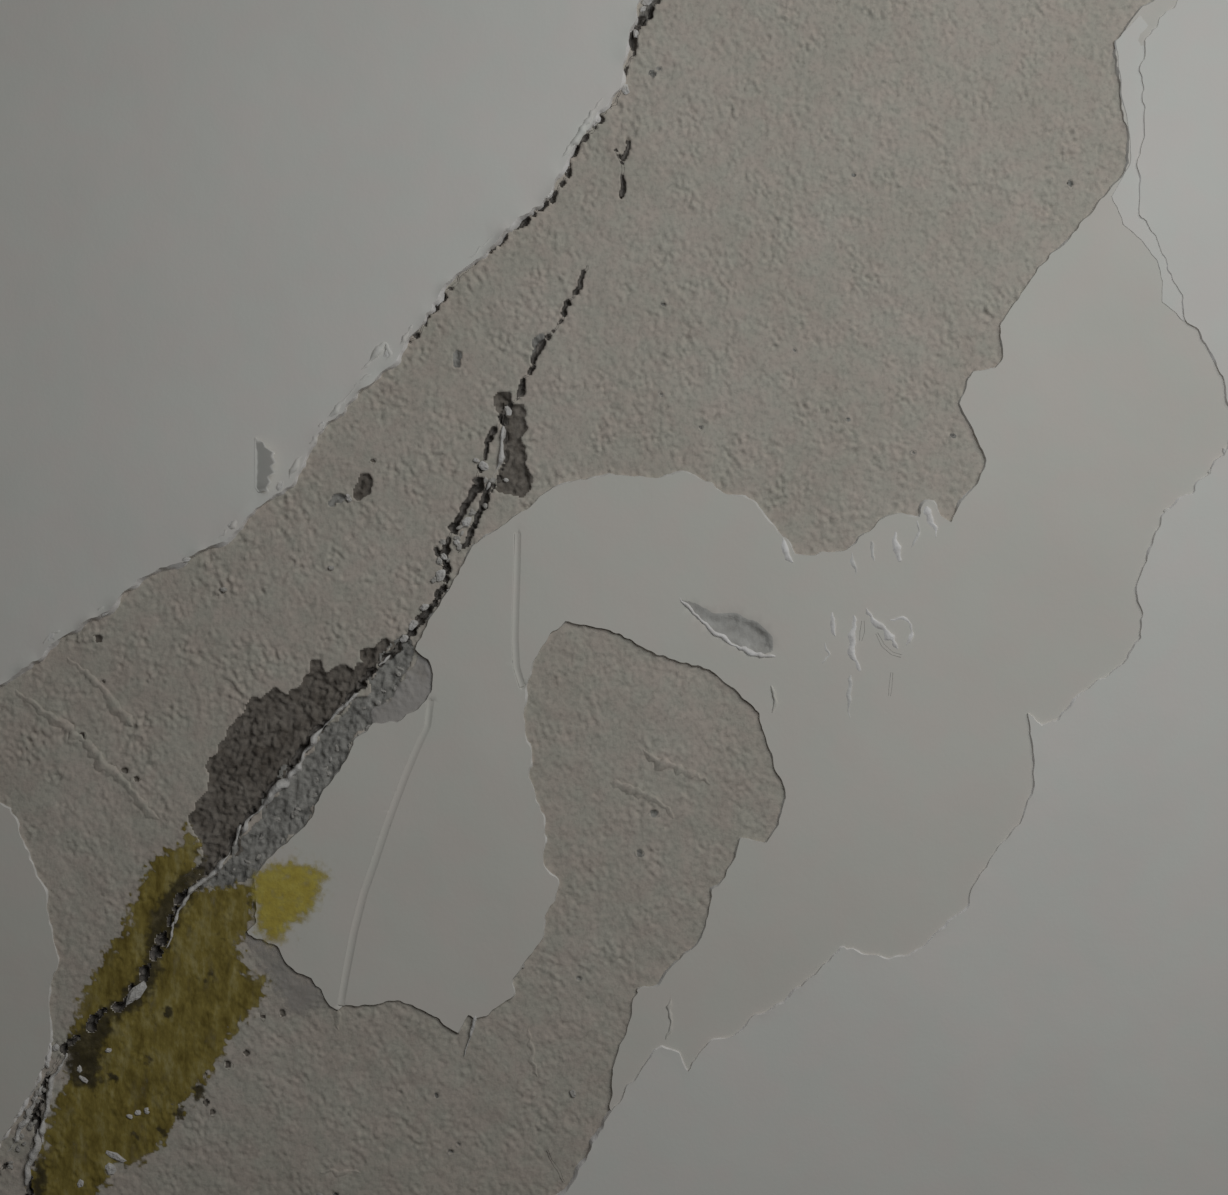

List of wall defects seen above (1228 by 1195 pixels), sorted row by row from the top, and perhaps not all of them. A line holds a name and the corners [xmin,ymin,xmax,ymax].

peeling [255,437,277,492]
crack [409,0,661,344]
peeling [1137,0,1178,206]
peeling [1138,215,1228,406]
peeling [0,1104,36,1195]
water stain [31,822,328,1195]
crack [0,266,587,1195]
peeling [95,590,874,1195]
peeling [878,446,1228,960]